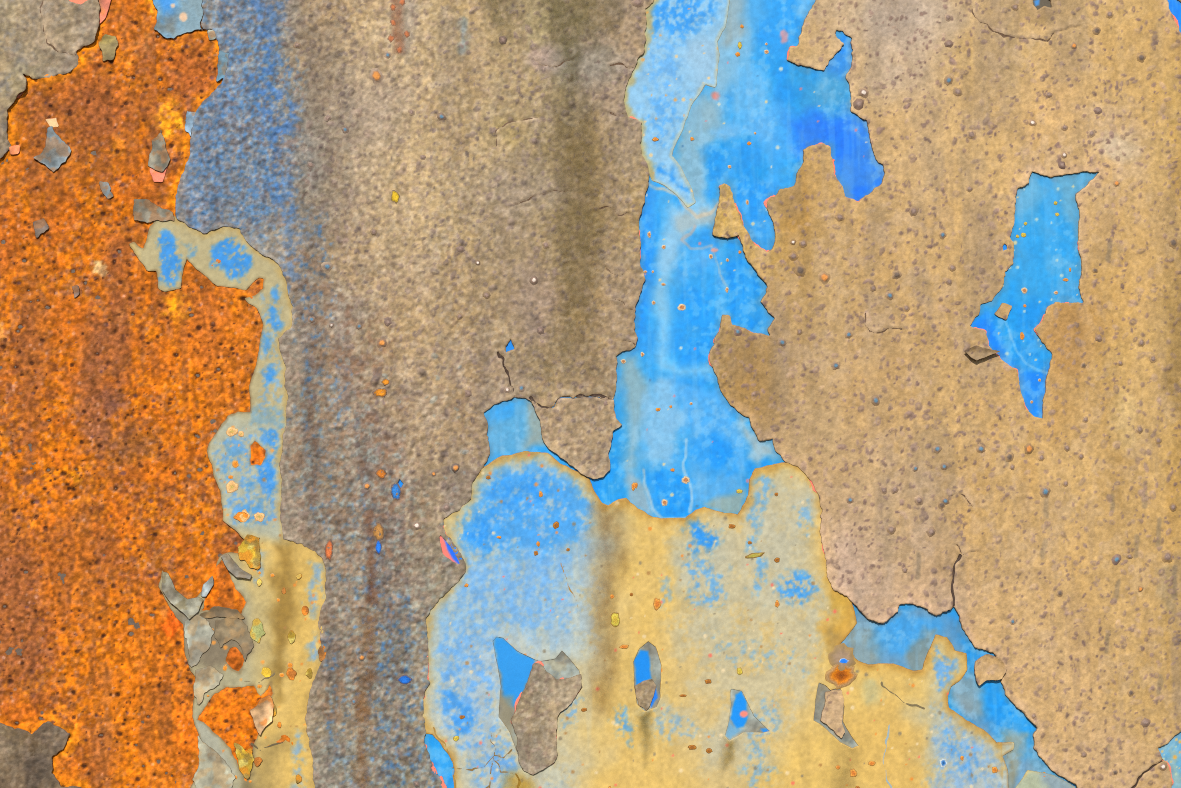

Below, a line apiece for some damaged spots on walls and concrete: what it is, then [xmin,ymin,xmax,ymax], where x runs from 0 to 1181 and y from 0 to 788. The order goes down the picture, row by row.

crack [972,9,1054,42]
peeling [1168,0,1181,32]
peeling [965,172,1098,418]
corrosion [0,0,293,788]
crack [497,352,610,408]
peeling [423,0,1076,788]
peeling [129,216,334,788]
crack [951,544,962,606]
peeling [397,675,413,685]
peeling [1158,732,1181,788]